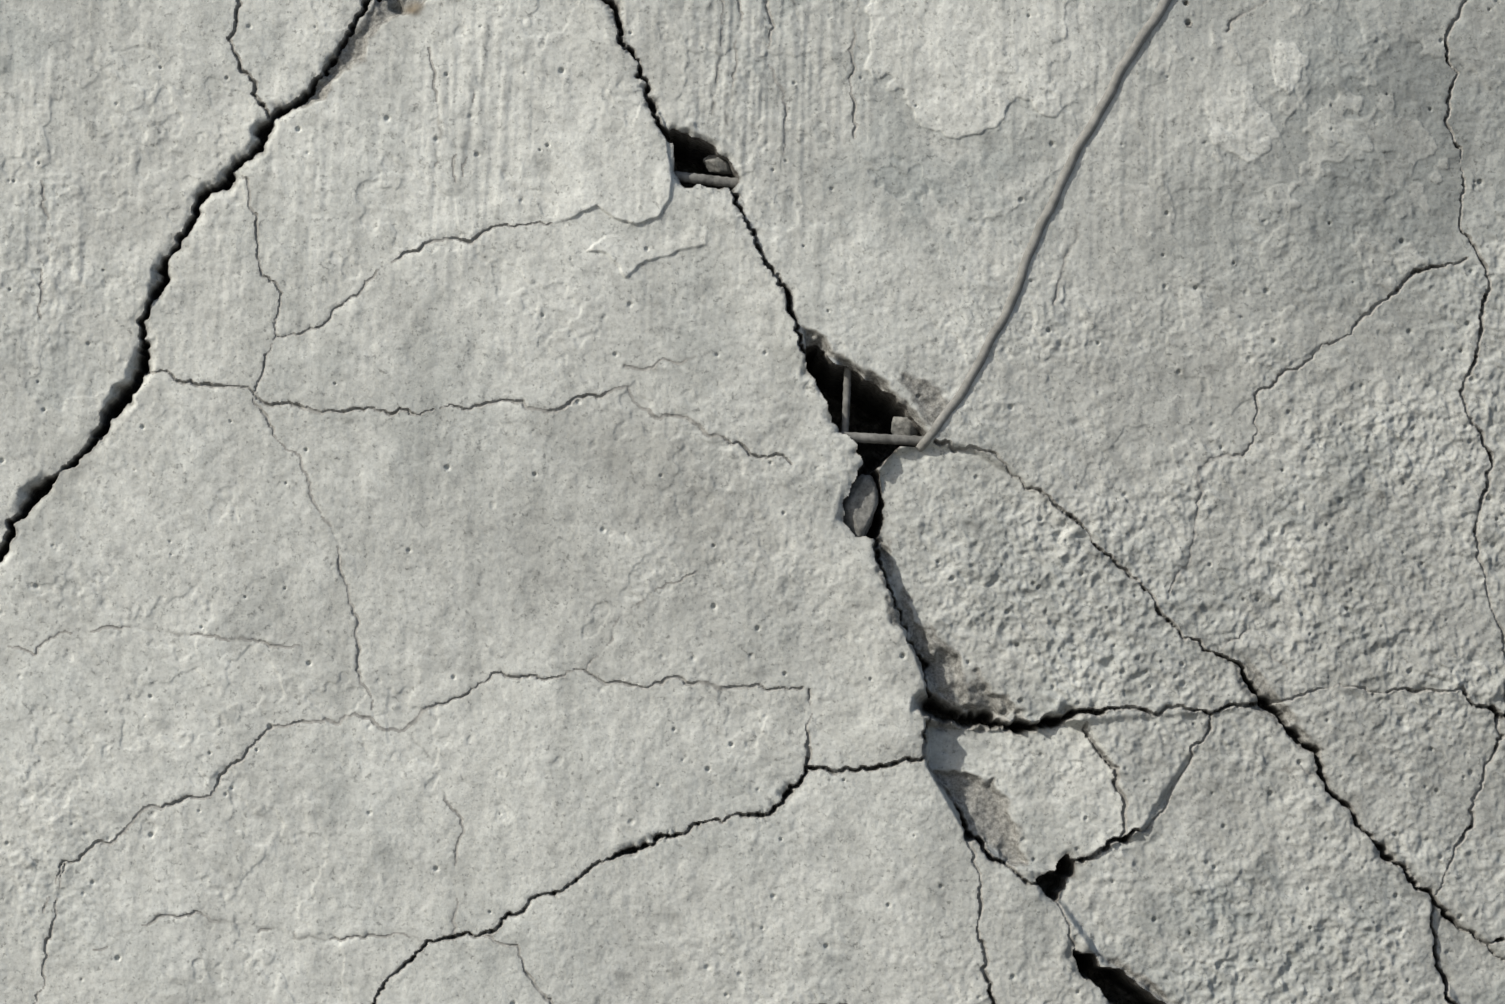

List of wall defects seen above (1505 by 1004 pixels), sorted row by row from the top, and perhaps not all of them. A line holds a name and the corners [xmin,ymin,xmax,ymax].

crack [847,0,859,139]
peeling [545,57,709,279]
crack [0,0,792,563]
crack [728,188,806,362]
spalling [799,323,952,441]
crack [1052,252,1069,306]
crack [1168,0,1505,658]
crack [7,625,131,656]
crack [33,438,1505,1004]
spalling [933,766,1034,869]
spalling [1094,948,1185,1004]